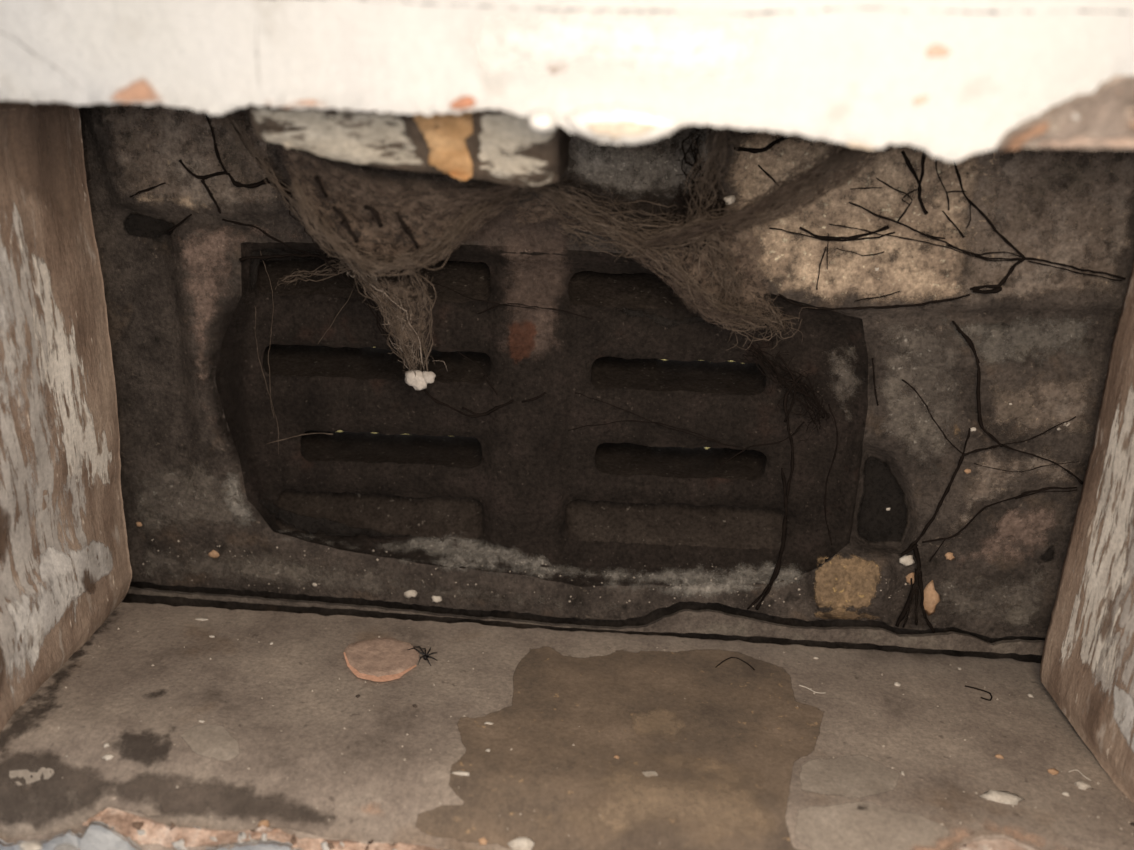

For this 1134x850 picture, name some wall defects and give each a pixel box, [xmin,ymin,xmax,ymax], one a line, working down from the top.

peeling [251,96,556,186]
peeling [585,120,658,139]
peeling [847,141,878,149]
flaking render [999,79,1134,151]
peeling [0,203,113,692]
peeling [1059,384,1134,751]
spalling [344,638,419,682]
leakage [416,646,949,850]
leakage [0,752,334,827]
flaking render [82,807,442,850]
flaking render [956,839,1026,850]